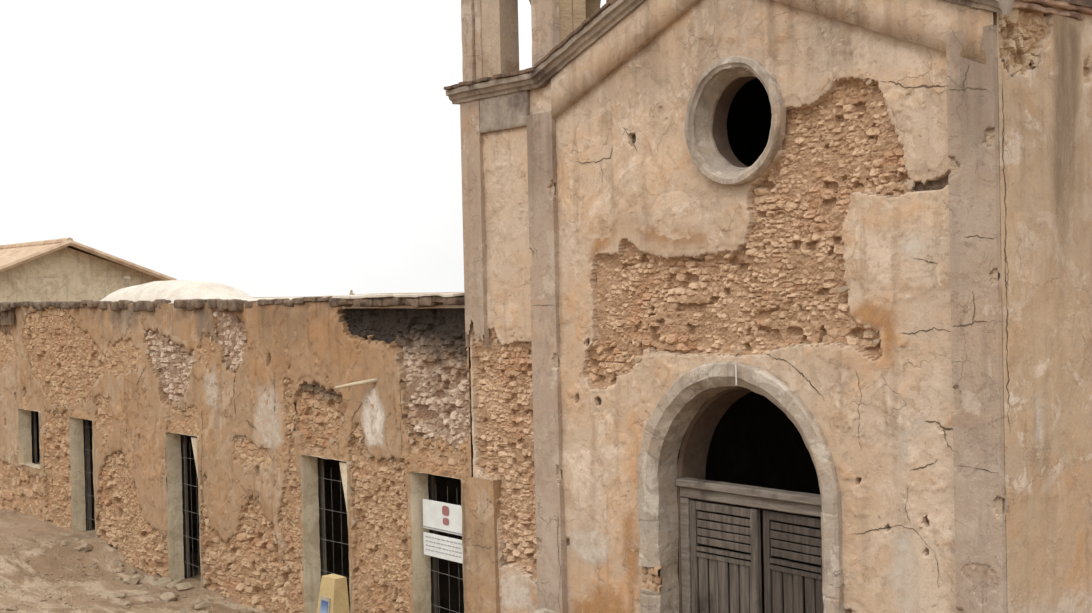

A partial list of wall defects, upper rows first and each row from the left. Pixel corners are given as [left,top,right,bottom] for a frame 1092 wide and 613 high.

spalling [997,8,1048,75]
spalling [586,79,928,405]
spalling [0,308,105,530]
spalling [97,451,169,578]
spalling [143,330,199,435]
spalling [213,310,248,372]
spalling [200,378,411,613]
spalling [343,308,537,581]
crack [849,499,939,586]
crack [909,420,997,473]